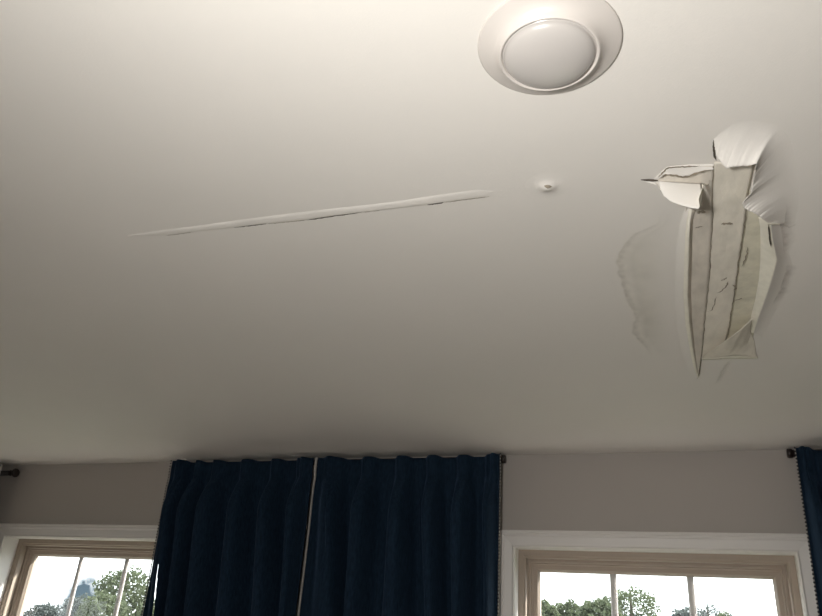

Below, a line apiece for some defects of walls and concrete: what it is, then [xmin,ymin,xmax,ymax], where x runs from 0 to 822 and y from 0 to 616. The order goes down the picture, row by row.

peeling [641,120,799,379]